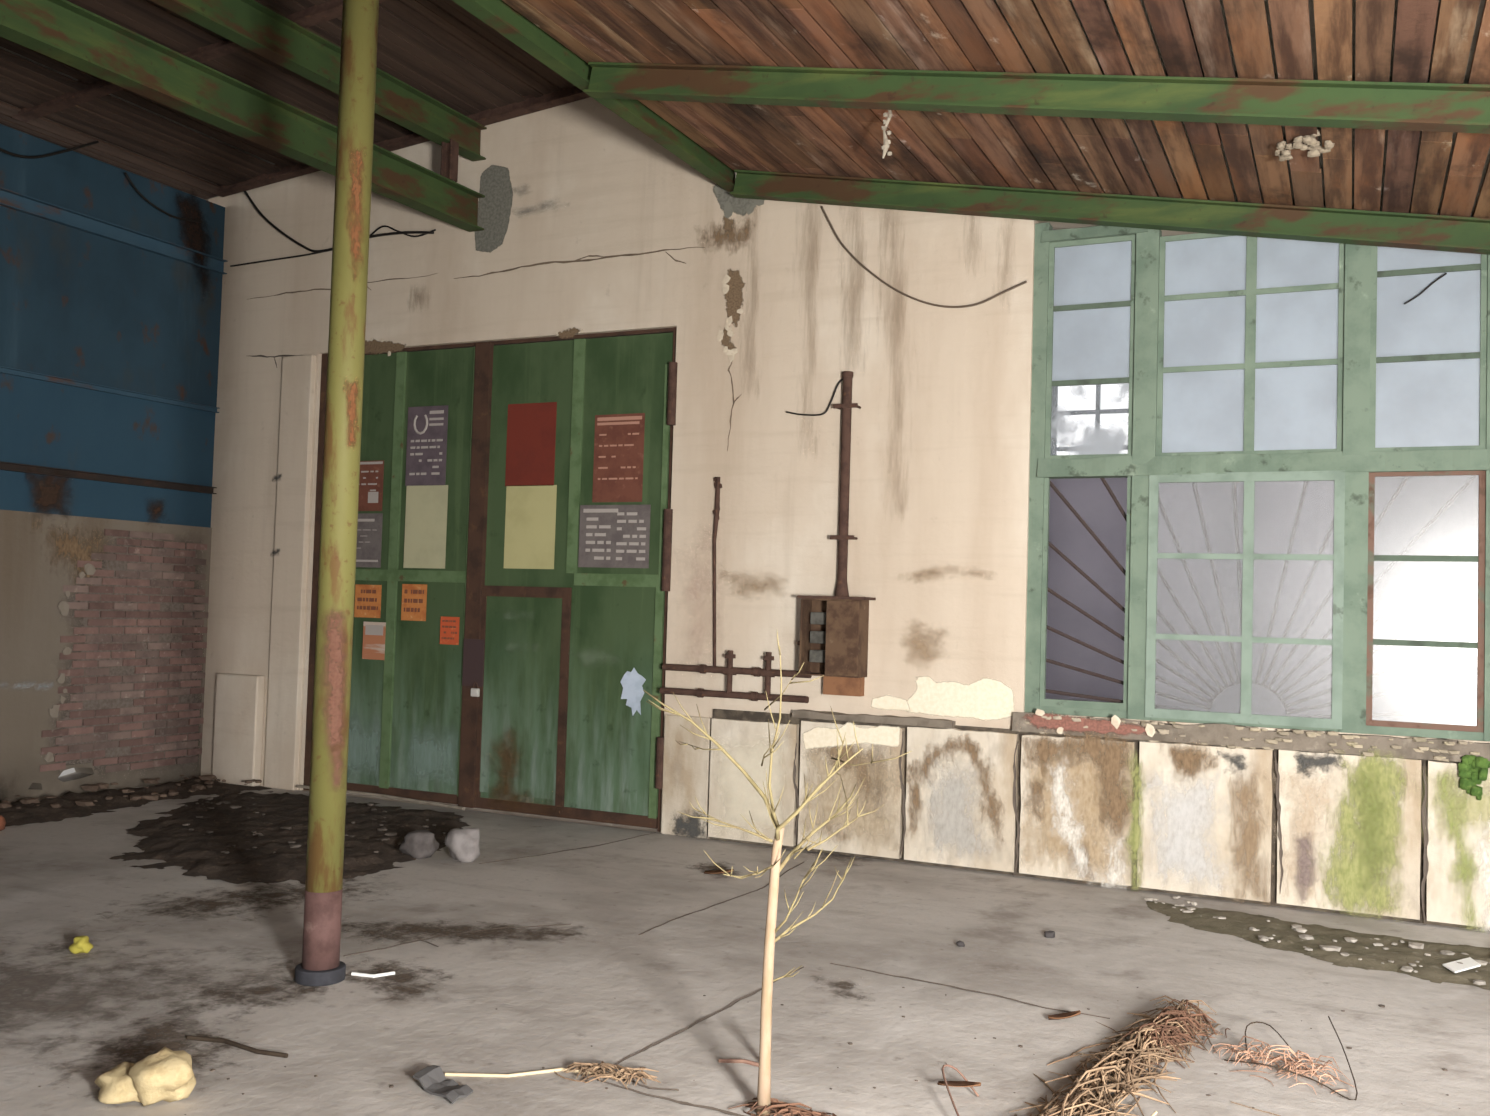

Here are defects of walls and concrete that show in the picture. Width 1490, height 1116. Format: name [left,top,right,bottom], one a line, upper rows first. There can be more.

corrosion [177,196,211,291]
crack [251,288,331,299]
corrosion [347,150,364,278]
crack [367,247,705,290]
peeling [717,269,745,362]
corrosion [343,382,358,447]
spalling [0,529,308,854]
corrosion [323,613,345,786]
water stain [807,737,1000,861]
water stain [1024,731,1266,898]
water stain [1446,780,1490,928]